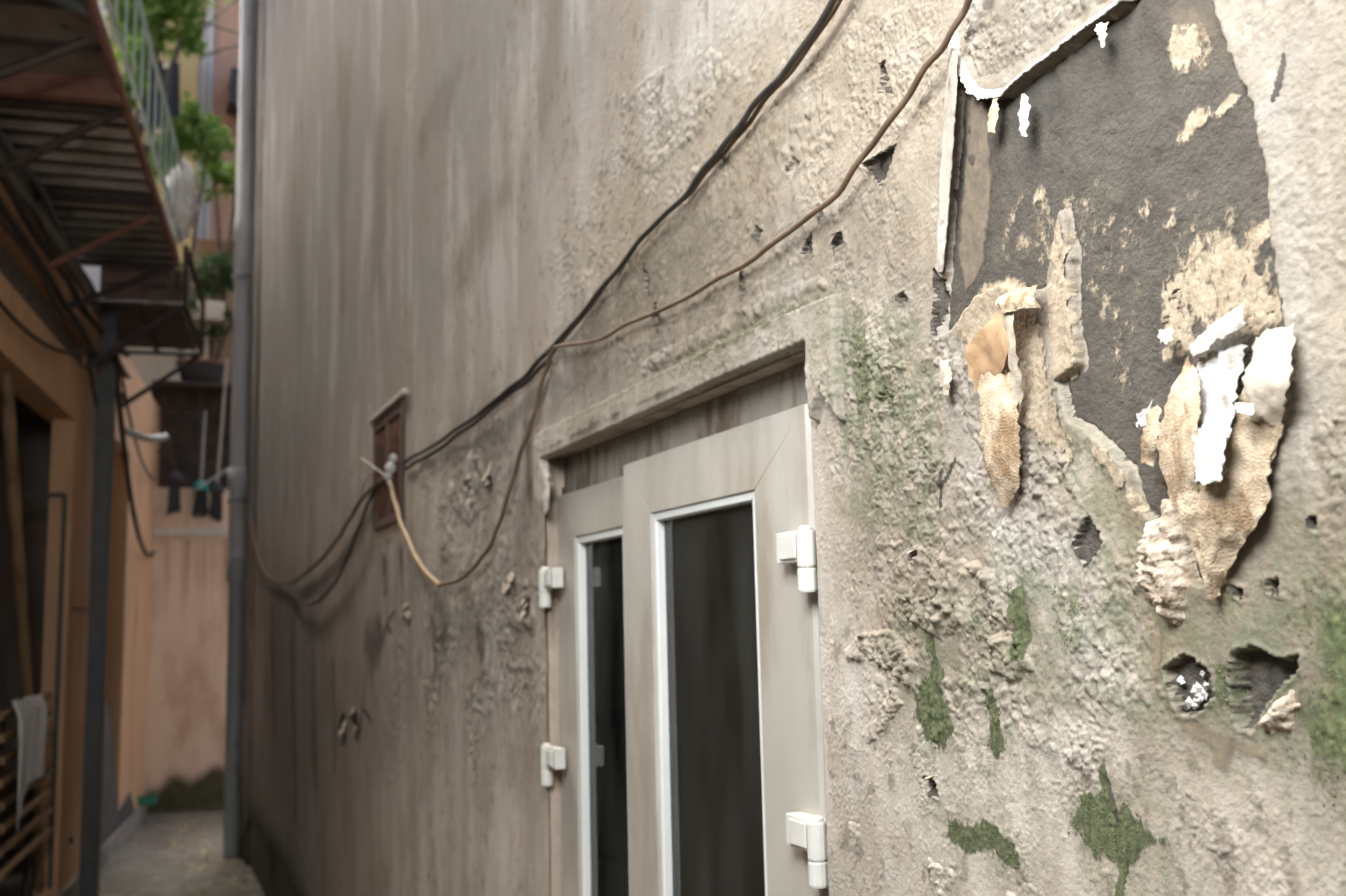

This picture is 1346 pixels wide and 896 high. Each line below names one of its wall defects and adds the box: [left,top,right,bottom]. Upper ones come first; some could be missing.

flaking render [930,0,1296,626]
spalling [338,707,360,748]
flaking render [1166,649,1301,736]